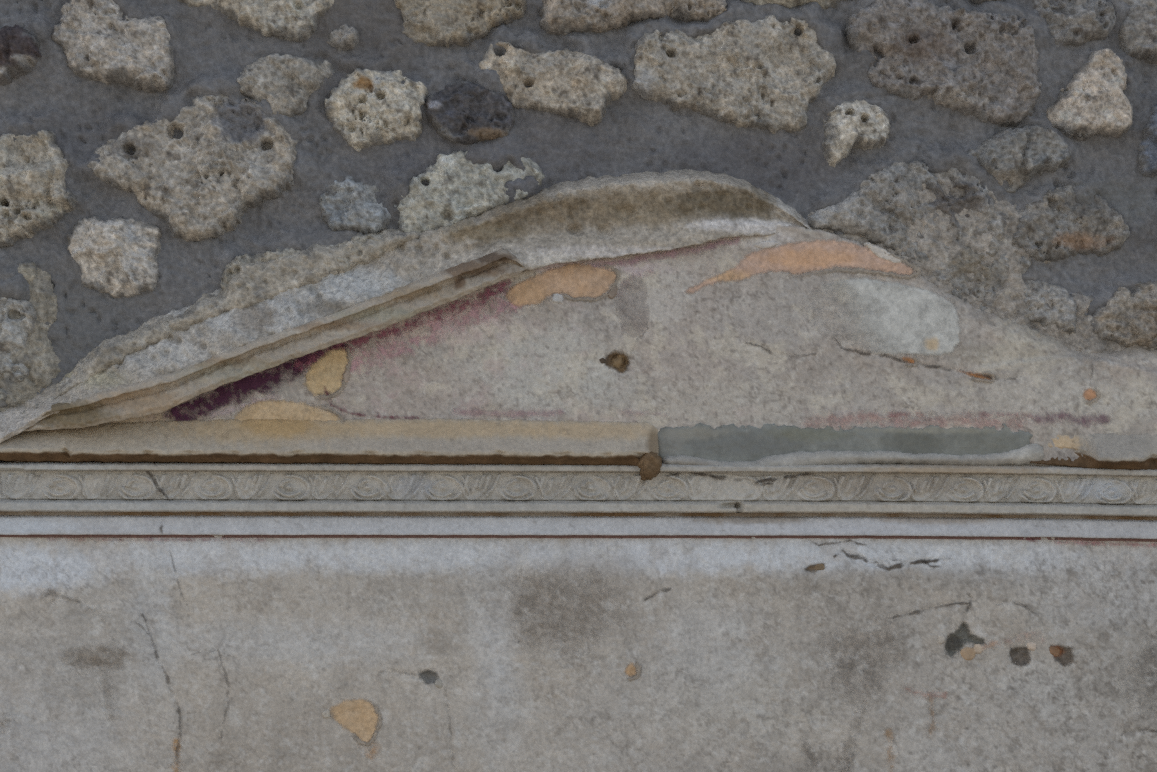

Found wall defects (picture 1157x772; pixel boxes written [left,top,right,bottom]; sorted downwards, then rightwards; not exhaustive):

peeling [687,240,921,292]
peeling [507,264,620,306]
peeling [235,348,352,423]
spalling [599,352,629,373]
peeling [967,372,995,383]
peeling [1084,389,1101,405]
crack [818,540,939,570]
spalling [937,623,984,660]
spalling [1010,642,1073,666]
peeling [322,699,382,746]